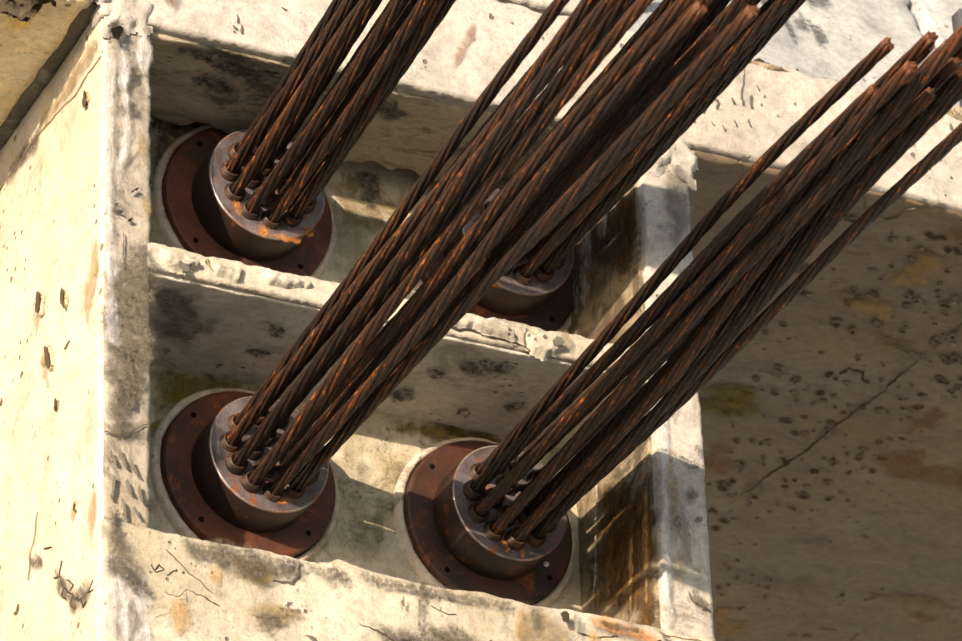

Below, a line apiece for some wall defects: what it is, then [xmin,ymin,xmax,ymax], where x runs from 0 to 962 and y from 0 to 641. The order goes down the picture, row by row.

spalling [0,0,56,23]
leakage [178,47,278,92]
leakage [105,35,151,239]
leakage [84,243,216,441]
leakage [159,364,241,409]
leakage [699,385,759,419]
leakage [594,423,698,626]